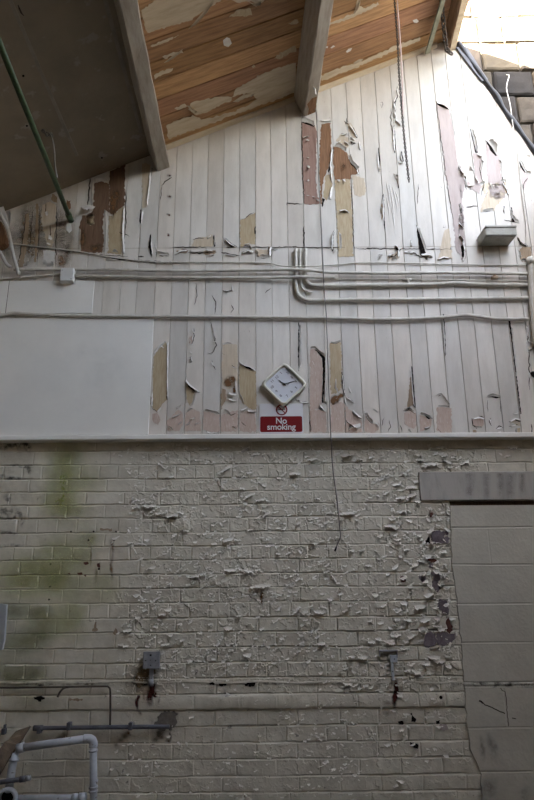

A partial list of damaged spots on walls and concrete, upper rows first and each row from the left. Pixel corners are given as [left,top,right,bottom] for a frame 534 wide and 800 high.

peeling [141,0,221,33]
peeling [166,46,297,139]
peeling [18,194,65,267]
peeling [78,165,128,255]
peeling [301,116,366,257]
peeling [378,102,519,262]
peeling [517,237,532,262]
peeling [519,154,531,190]
peeling [150,341,257,434]
peeling [295,340,452,433]
spalling [93,442,469,800]
corrosion [135,685,157,714]